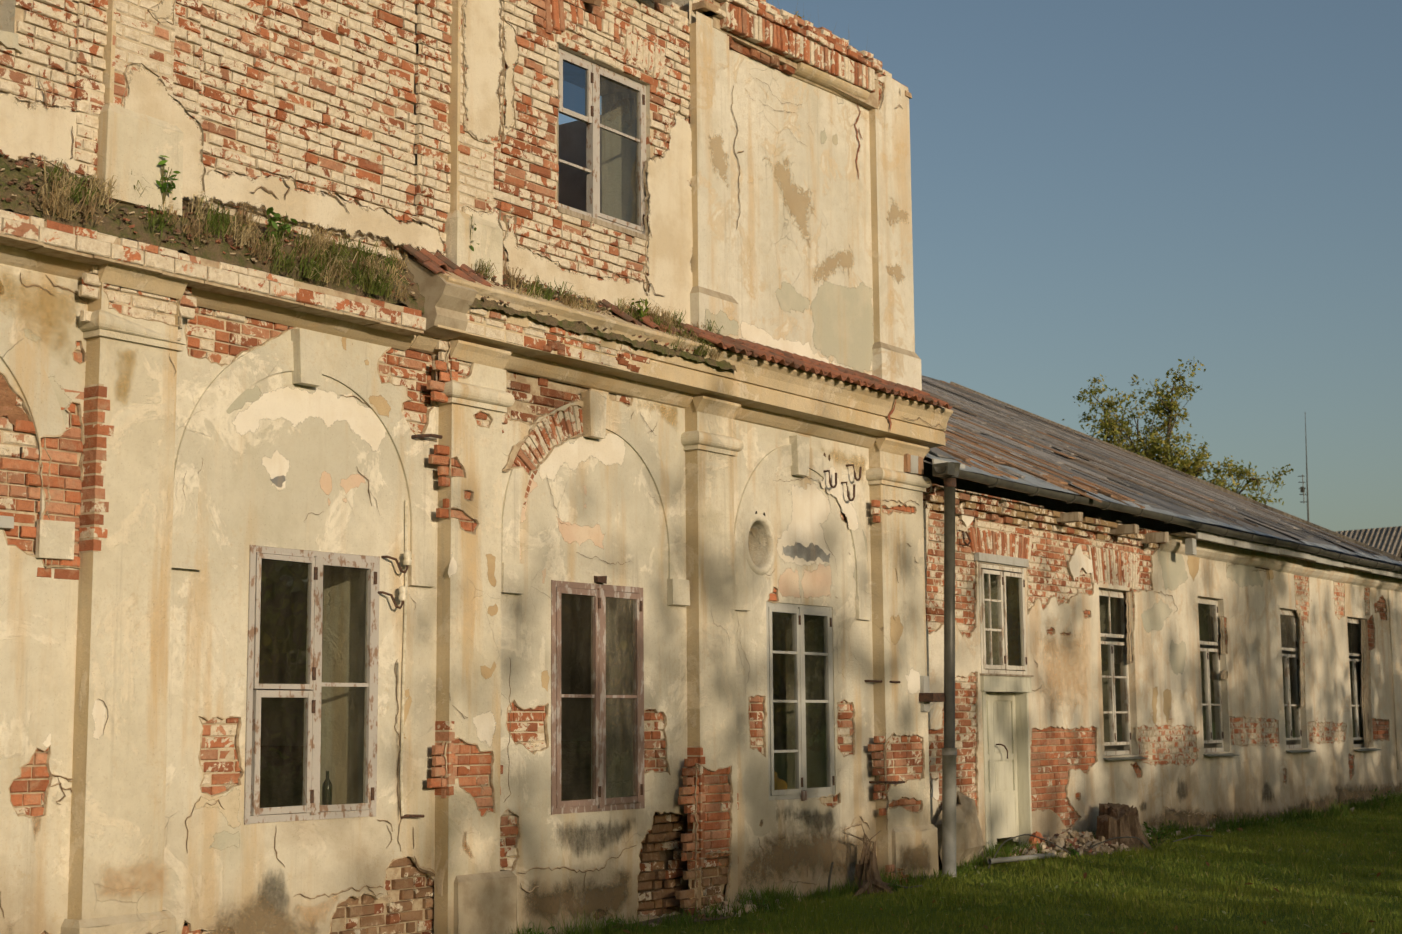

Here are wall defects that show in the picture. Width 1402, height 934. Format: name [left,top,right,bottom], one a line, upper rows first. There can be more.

flaking render [0,0,108,179]
flaking render [173,0,453,261]
flaking render [493,0,691,303]
crack [731,75,813,227]
flaking render [78,265,297,367]
flaking render [0,371,114,580]
flaking render [767,453,1201,778]
flaking render [9,732,53,818]
flaking render [427,670,549,872]
flaking render [636,708,739,918]
flaking render [836,671,979,816]
flaking render [1030,725,1098,828]